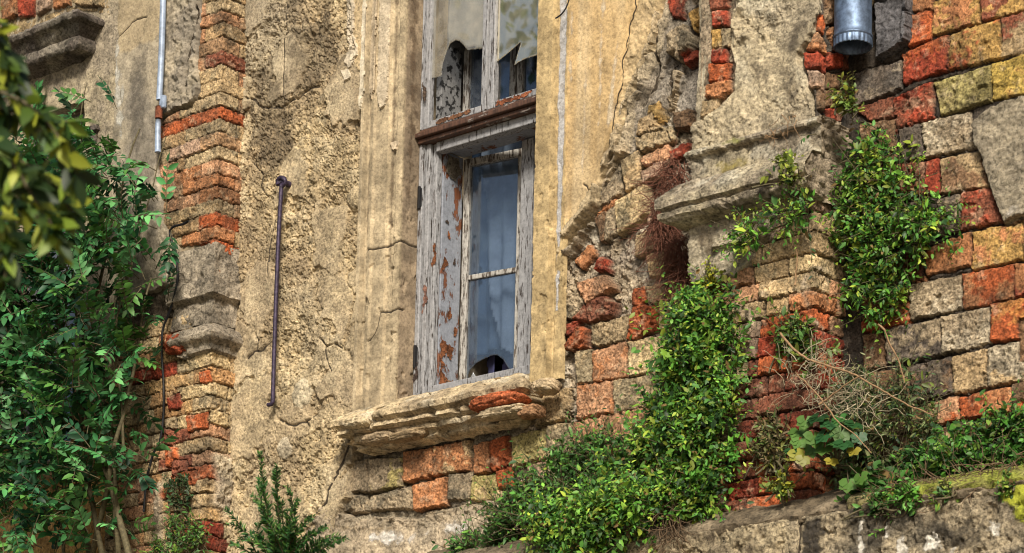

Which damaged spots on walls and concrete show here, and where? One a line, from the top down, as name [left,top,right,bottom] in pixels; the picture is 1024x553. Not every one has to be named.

spalling [159,0,247,264]
crack [600,0,681,163]
spalling [340,0,1024,520]
spalling [105,289,235,553]
crack [316,445,350,514]